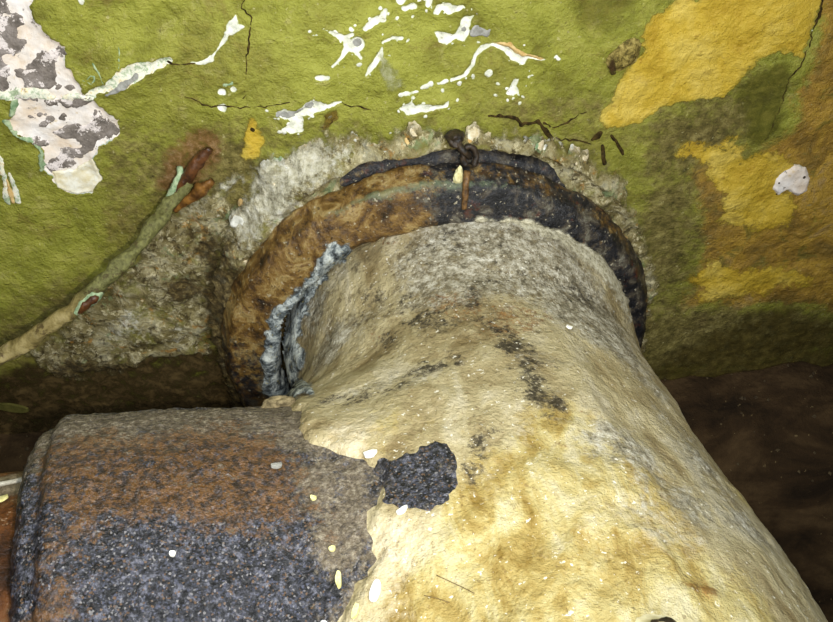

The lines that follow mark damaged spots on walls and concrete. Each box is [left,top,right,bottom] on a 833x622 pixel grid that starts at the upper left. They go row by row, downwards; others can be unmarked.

peeling [0,156,21,205]
peeling [0,0,120,194]
crack [85,0,253,98]
corrosion [159,131,220,189]
crack [186,96,290,109]
peeling [265,99,342,135]
crack [321,102,371,128]
peeling [308,0,561,118]
crack [488,112,624,165]
spalling [773,164,810,196]
crack [765,0,823,140]
peeling [363,441,458,515]